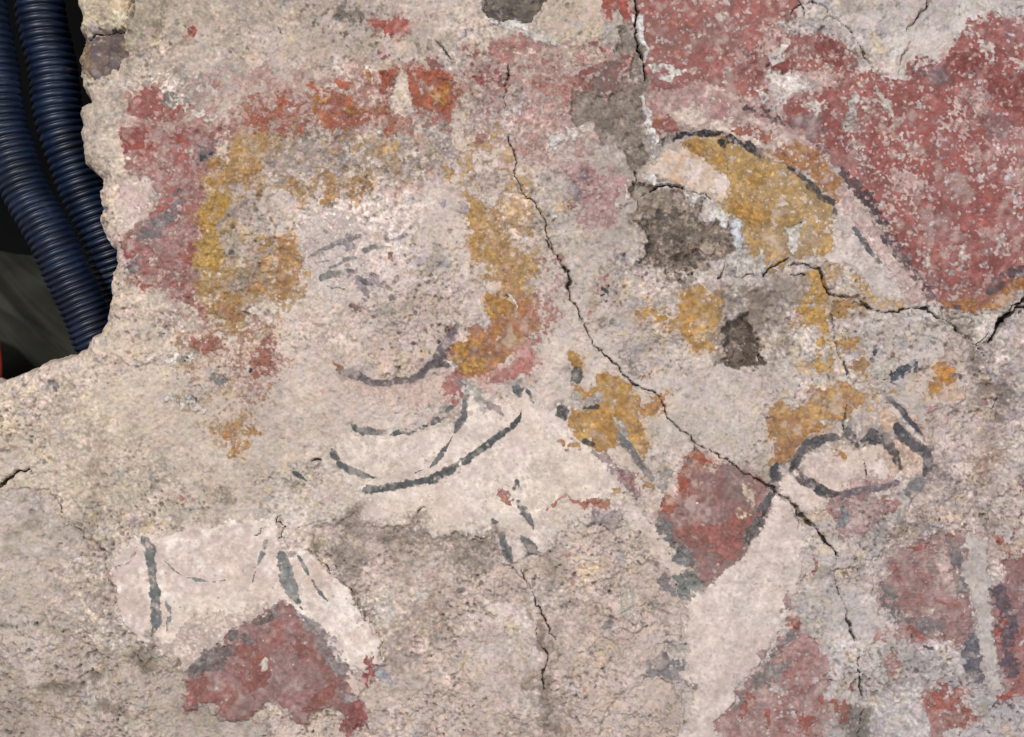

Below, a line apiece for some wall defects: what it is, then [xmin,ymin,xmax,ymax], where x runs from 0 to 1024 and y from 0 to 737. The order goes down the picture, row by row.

spalling [567,25,650,170]
crack [633,1,646,81]
spalling [620,174,738,288]
spalling [714,311,767,371]
crack [746,259,958,375]
crack [987,296,1024,342]
crack [527,198,863,731]
crack [521,569,556,689]